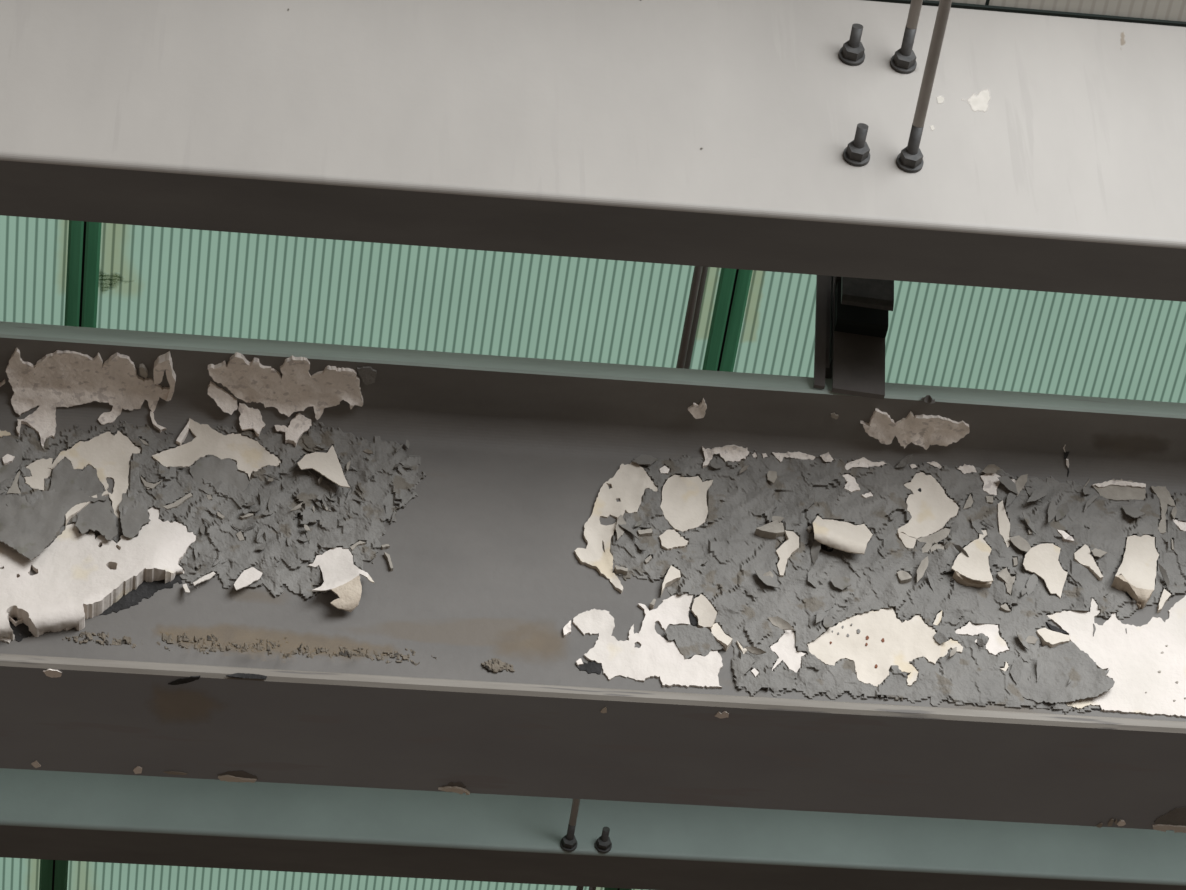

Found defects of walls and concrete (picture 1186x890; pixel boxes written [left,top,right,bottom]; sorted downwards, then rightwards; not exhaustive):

peeling [0,348,427,643]
peeling [563,395,1186,718]
peeling [1153,806,1186,833]